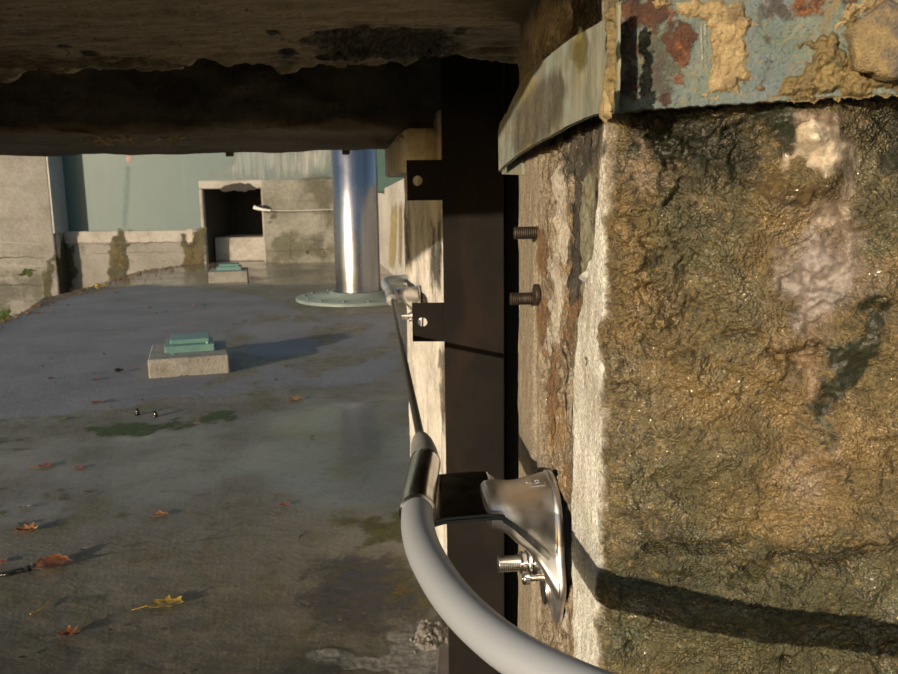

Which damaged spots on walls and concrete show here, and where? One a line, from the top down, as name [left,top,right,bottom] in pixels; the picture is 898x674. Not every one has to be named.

rust [620,0,698,100]
damp [652,0,898,333]
damp [0,233,69,298]
damp [184,229,196,262]
damp [798,351,818,397]
crack [664,536,742,573]
crack [733,541,898,614]